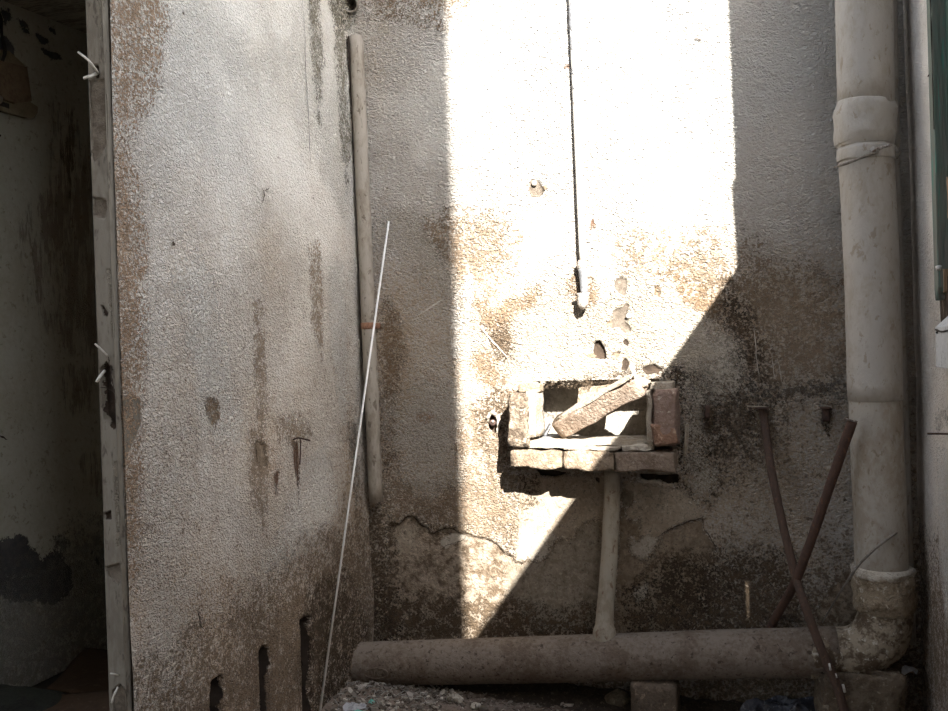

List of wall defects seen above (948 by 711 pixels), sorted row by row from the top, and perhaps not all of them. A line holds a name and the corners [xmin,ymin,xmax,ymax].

water stain [308,0,477,184]
peeling [102,361,121,430]
corrosion [275,411,312,486]
water stain [133,203,599,711]
flaking render [587,277,632,371]
water stain [544,224,846,504]
flaking render [386,516,602,640]